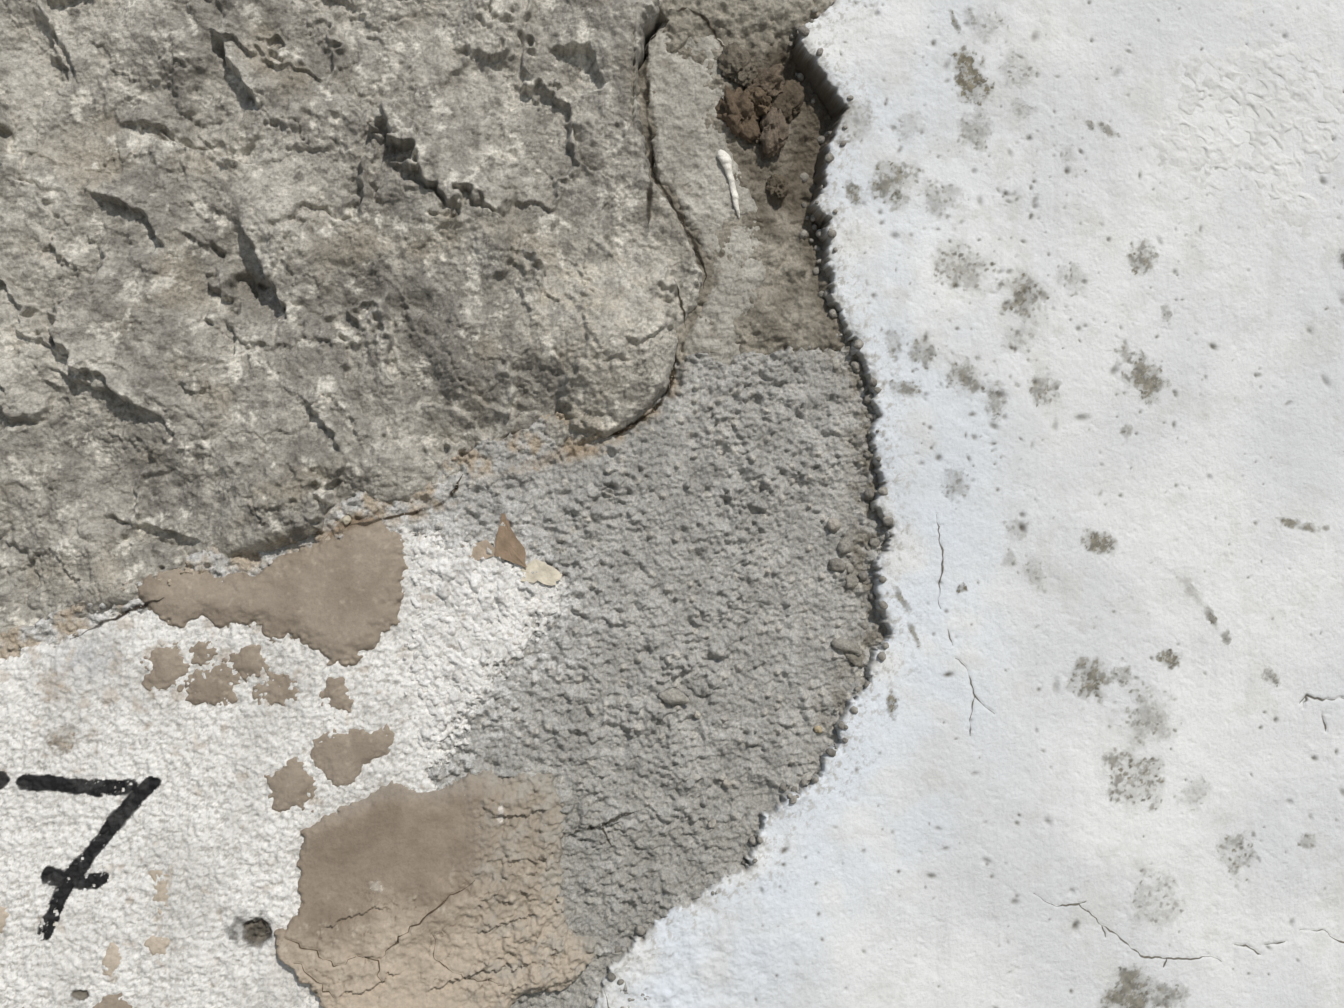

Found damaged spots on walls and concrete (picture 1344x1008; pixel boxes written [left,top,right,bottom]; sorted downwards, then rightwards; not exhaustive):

damp [953,47,994,106]
crack [609,7,724,437]
damp [951,363,998,397]
damp [1122,347,1164,404]
spalling [0,0,894,1008]
crack [936,514,995,734]
damp [1071,660,1140,697]
damp [1158,649,1179,669]
crack [1299,695,1344,731]
damp [1110,755,1164,809]
crack [1034,893,1344,968]
damp [1105,967,1181,1008]